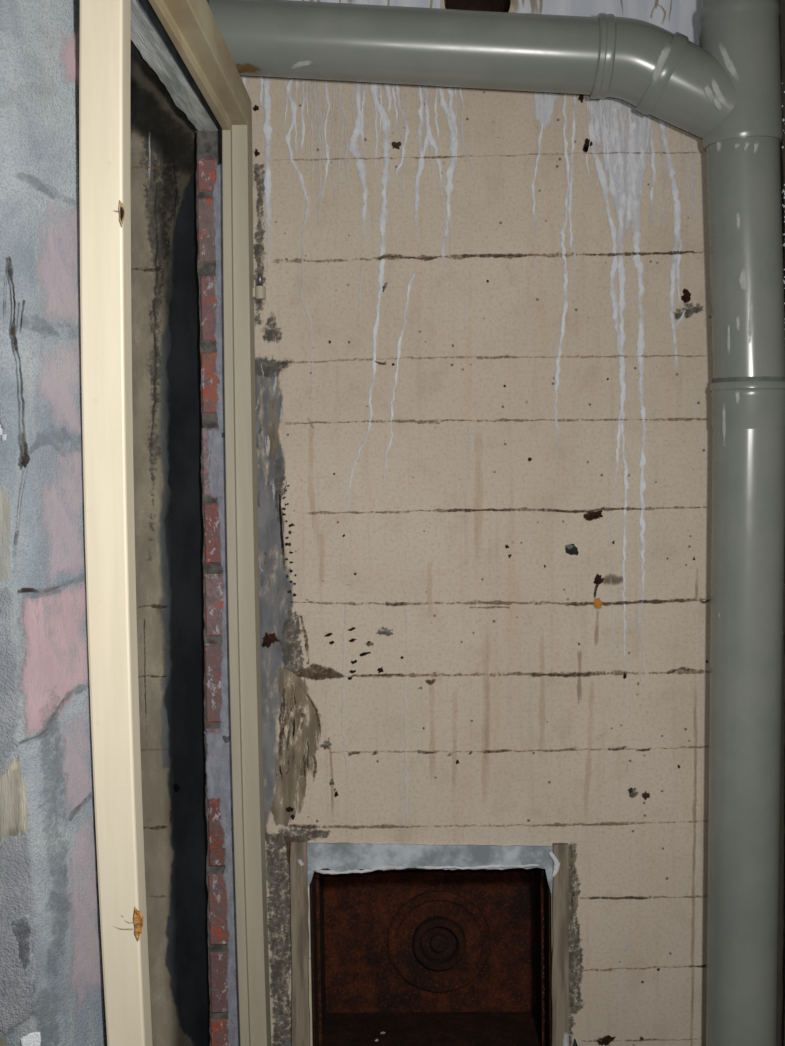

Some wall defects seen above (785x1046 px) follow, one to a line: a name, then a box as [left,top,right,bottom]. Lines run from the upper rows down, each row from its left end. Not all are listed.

flaking render [64,41,79,80]
flaking render [41,214,80,318]
efflorescence [259,60,475,507]
crack [0,256,30,546]
efflorescence [531,92,694,665]
flaking render [23,586,86,731]
spalling [255,357,393,1046]
spalling [0,756,28,840]
flaking render [73,882,103,984]
peeling [21,1032,41,1046]